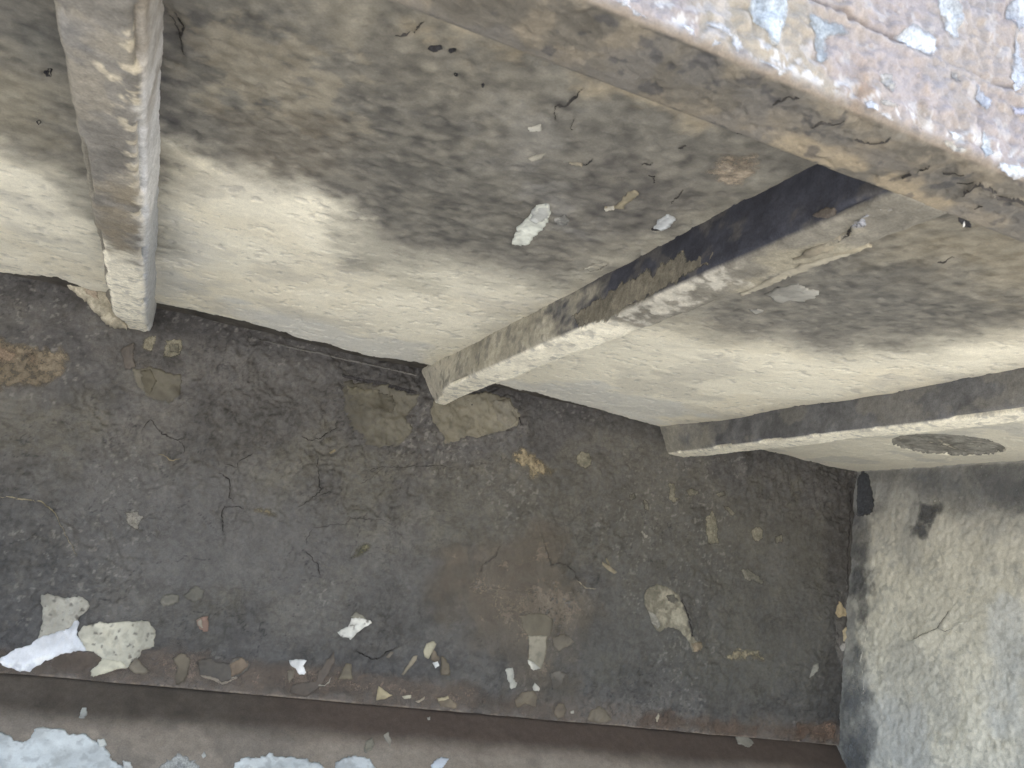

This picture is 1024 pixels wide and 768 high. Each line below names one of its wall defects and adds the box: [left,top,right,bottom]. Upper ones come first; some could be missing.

peeling [750,0,788,42]
peeling [981,130,1024,179]
peeling [512,203,551,246]
peeling [430,391,521,444]
crack [220,454,252,531]
crack [298,427,337,507]
water stain [855,471,874,516]
water stain [913,505,942,539]
peeling [0,593,156,677]
peeling [338,612,372,640]
spalling [644,584,703,652]
water stain [841,649,874,768]